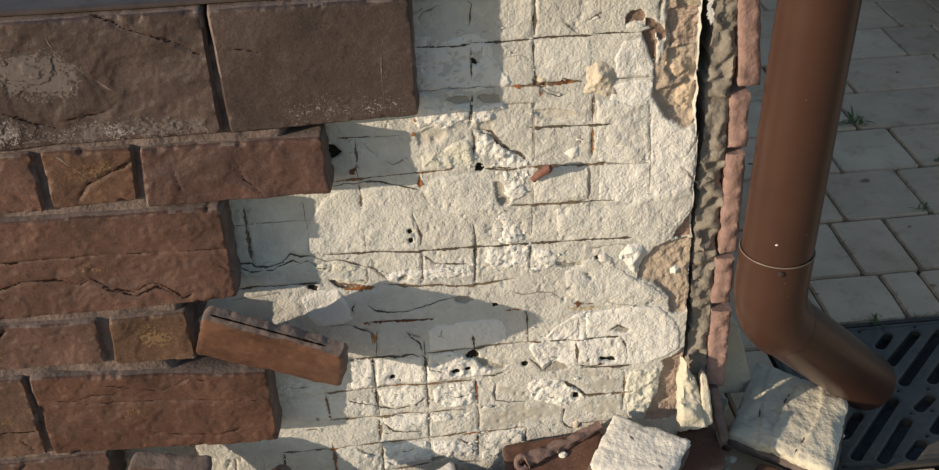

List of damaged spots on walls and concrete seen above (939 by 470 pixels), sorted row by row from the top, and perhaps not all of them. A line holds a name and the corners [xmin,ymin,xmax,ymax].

water stain [0,47,93,106]
water stain [0,111,213,150]
spalling [328,144,342,158]
crack [79,161,131,197]
peeling [241,186,415,277]
crack [188,0,656,470]
peeling [414,0,715,423]
crack [0,255,191,301]
peeling [383,265,474,282]
peeling [301,285,352,326]
crack [56,379,255,405]
peeling [280,319,524,470]